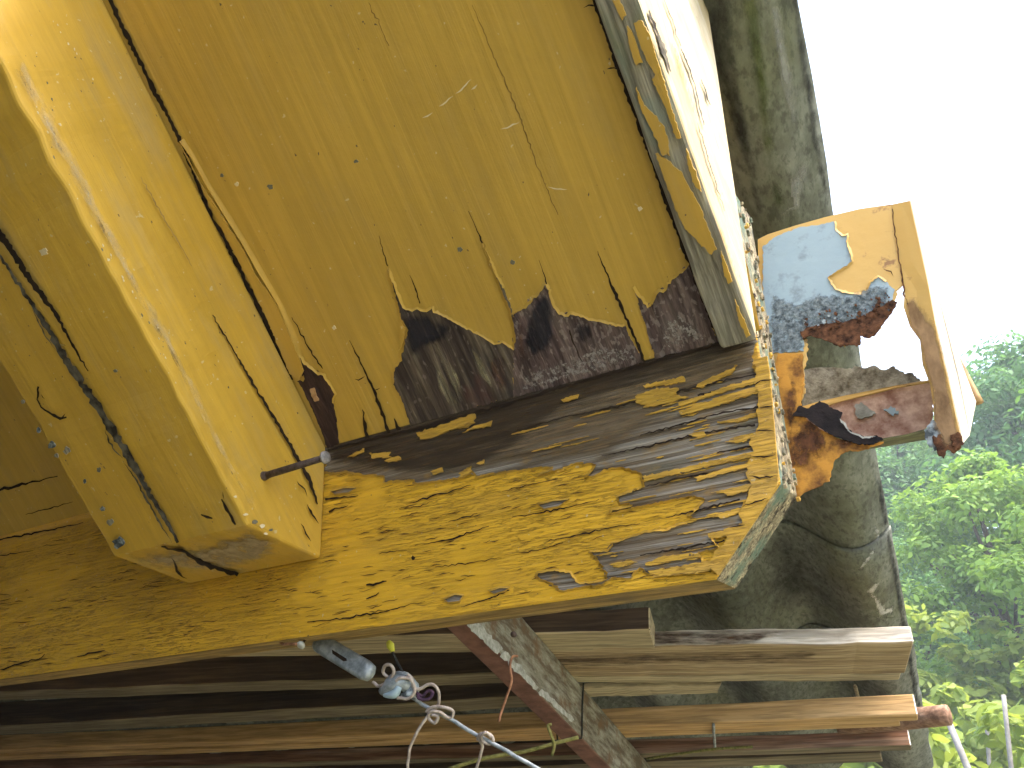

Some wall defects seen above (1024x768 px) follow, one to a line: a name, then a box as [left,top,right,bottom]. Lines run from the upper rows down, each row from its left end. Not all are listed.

crack [108,0,323,380]
peeling [612,0,732,284]
crack [0,229,239,579]
peeling [324,202,895,593]
rust [771,286,964,466]
peeling [443,593,464,604]